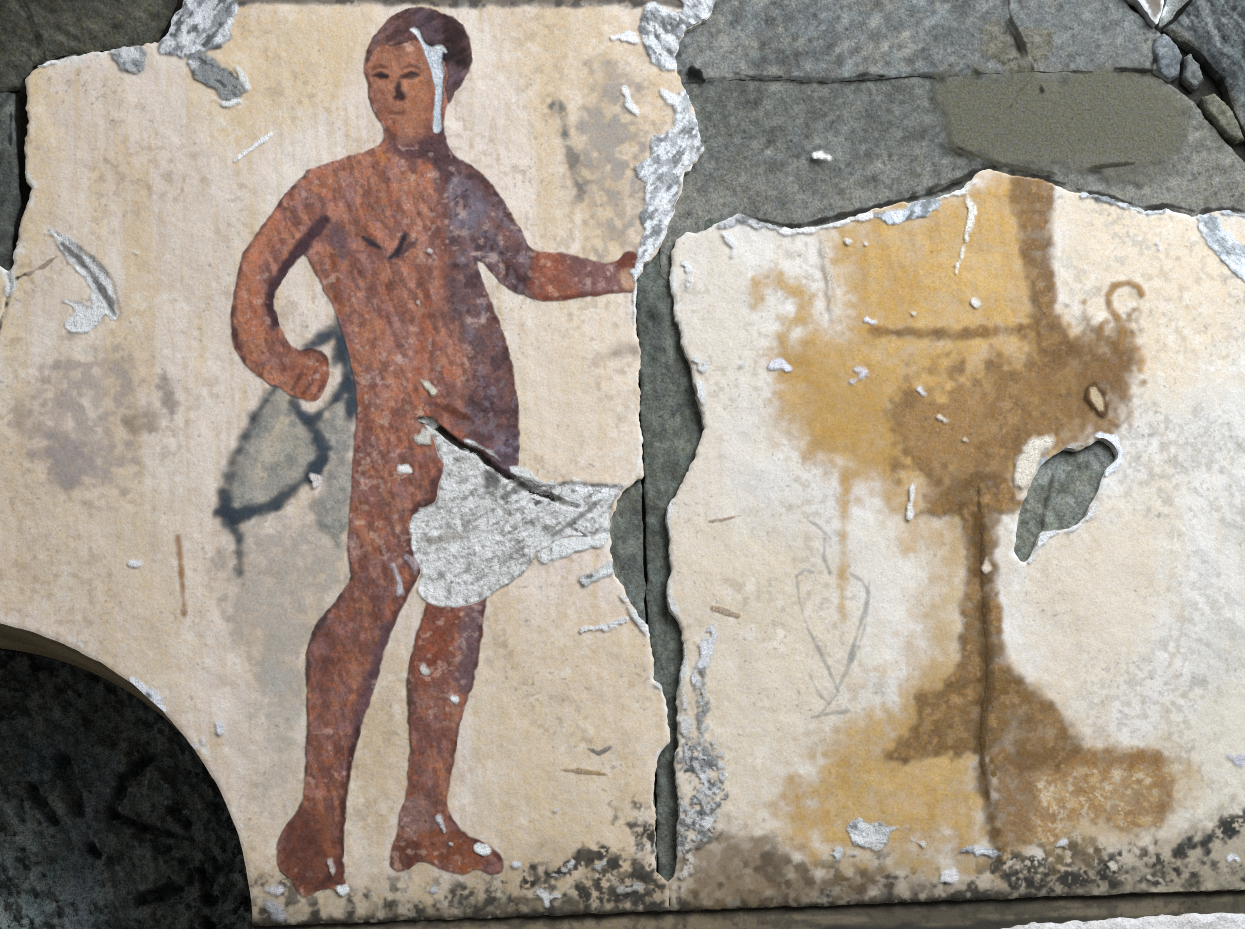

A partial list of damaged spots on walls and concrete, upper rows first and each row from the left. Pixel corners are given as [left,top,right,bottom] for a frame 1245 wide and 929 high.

flaking render [110,0,251,107]
peeling [410,27,446,133]
flaking render [611,0,715,70]
crack [0,257,55,329]
flaking render [631,88,704,323]
flaking render [717,180,977,313]
water stain [779,176,1043,513]
water stain [979,425,1060,476]
flaking render [391,417,626,607]
water stain [678,543,987,907]
mould [515,800,665,912]
mould [990,809,1245,895]